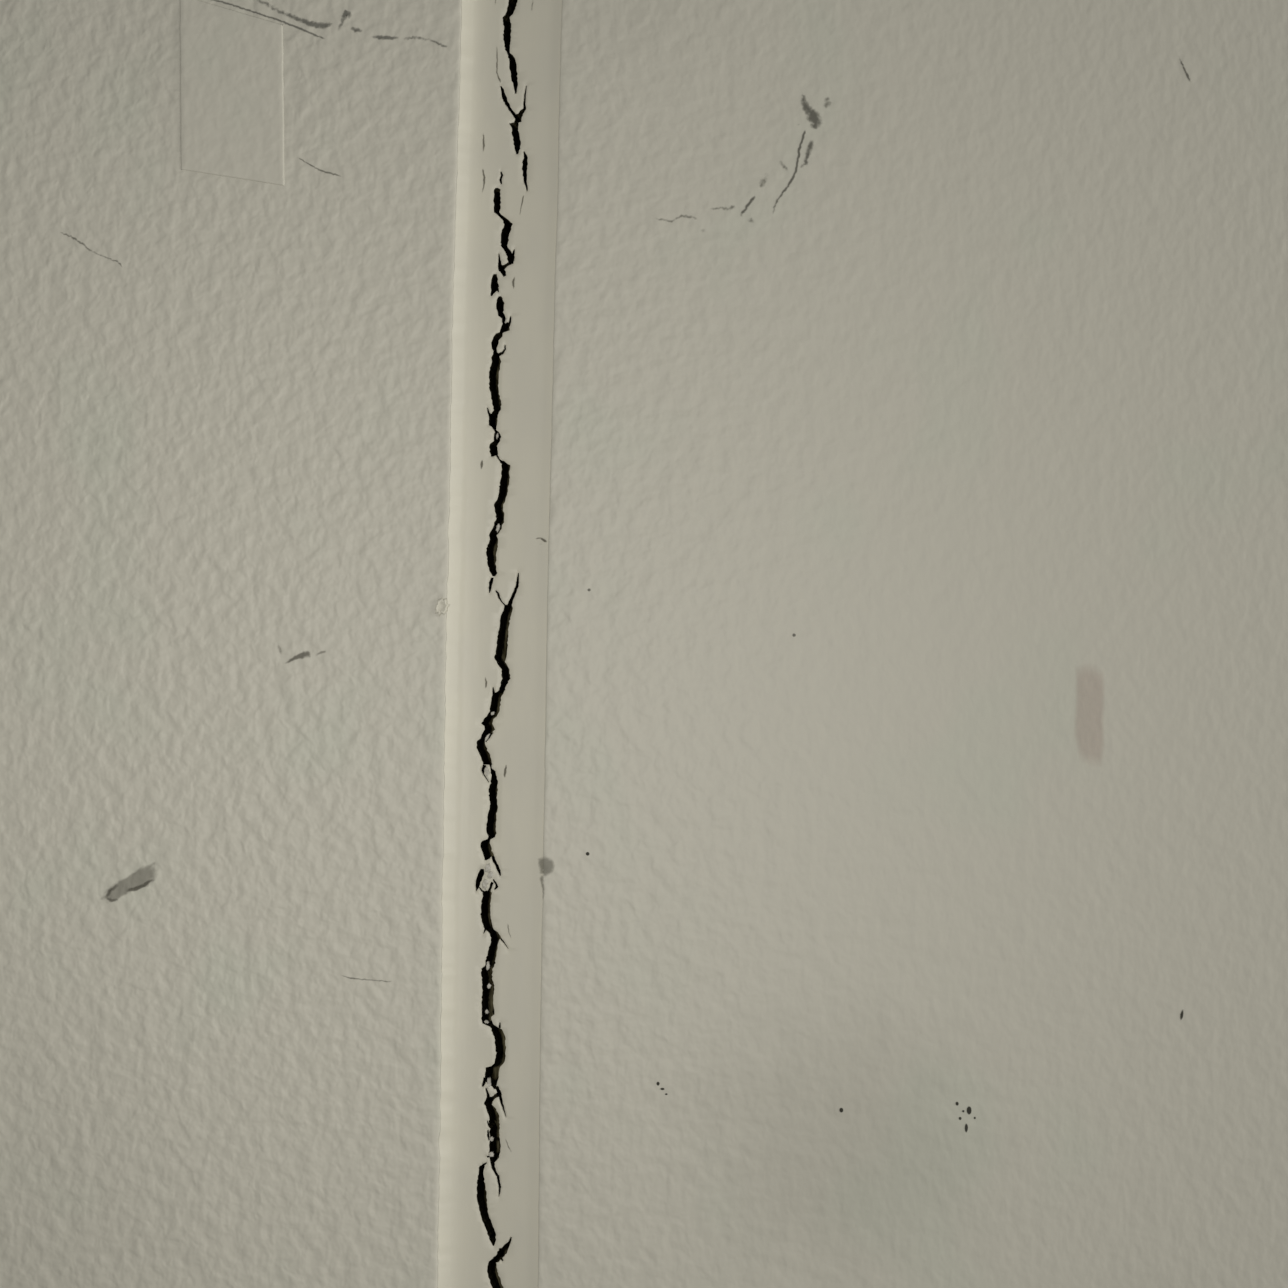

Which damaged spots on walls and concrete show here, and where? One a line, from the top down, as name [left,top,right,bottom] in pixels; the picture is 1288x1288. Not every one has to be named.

crack [475,0,528,1288]
crack [742,99,818,213]